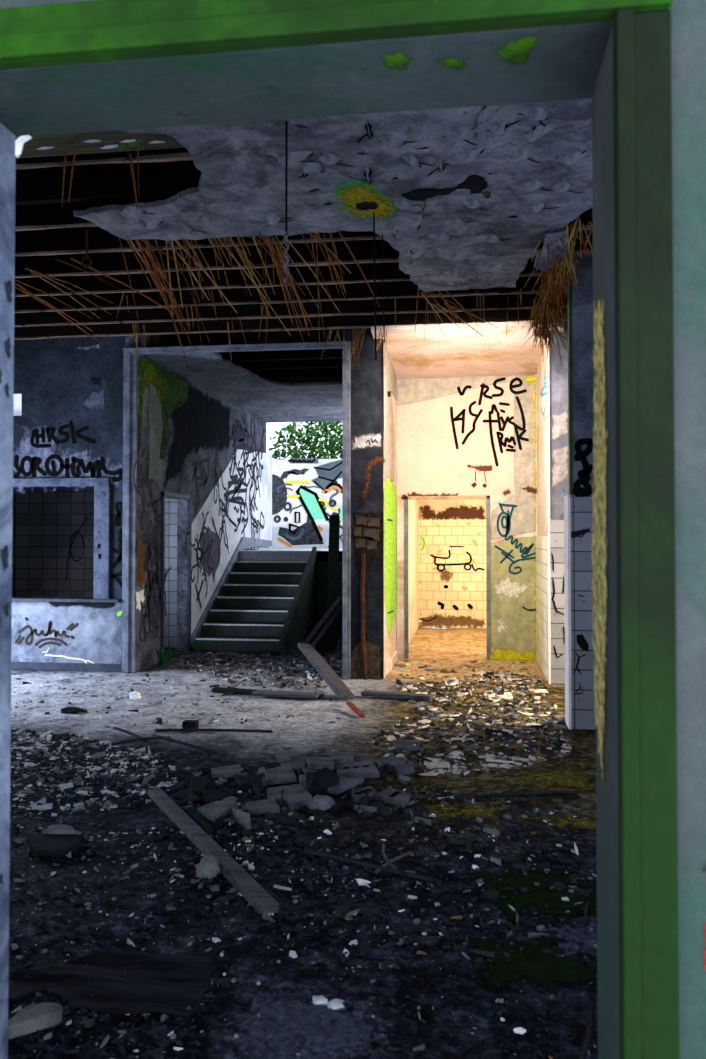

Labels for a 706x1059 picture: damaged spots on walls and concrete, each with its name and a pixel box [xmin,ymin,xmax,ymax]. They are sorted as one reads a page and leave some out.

flaking render [15,135,32,158]
water stain [333,180,397,218]
spalling [401,174,491,201]
water stain [139,381,147,447]
corrosion [362,456,385,499]
spalling [351,511,383,680]
crack [42,648,93,663]